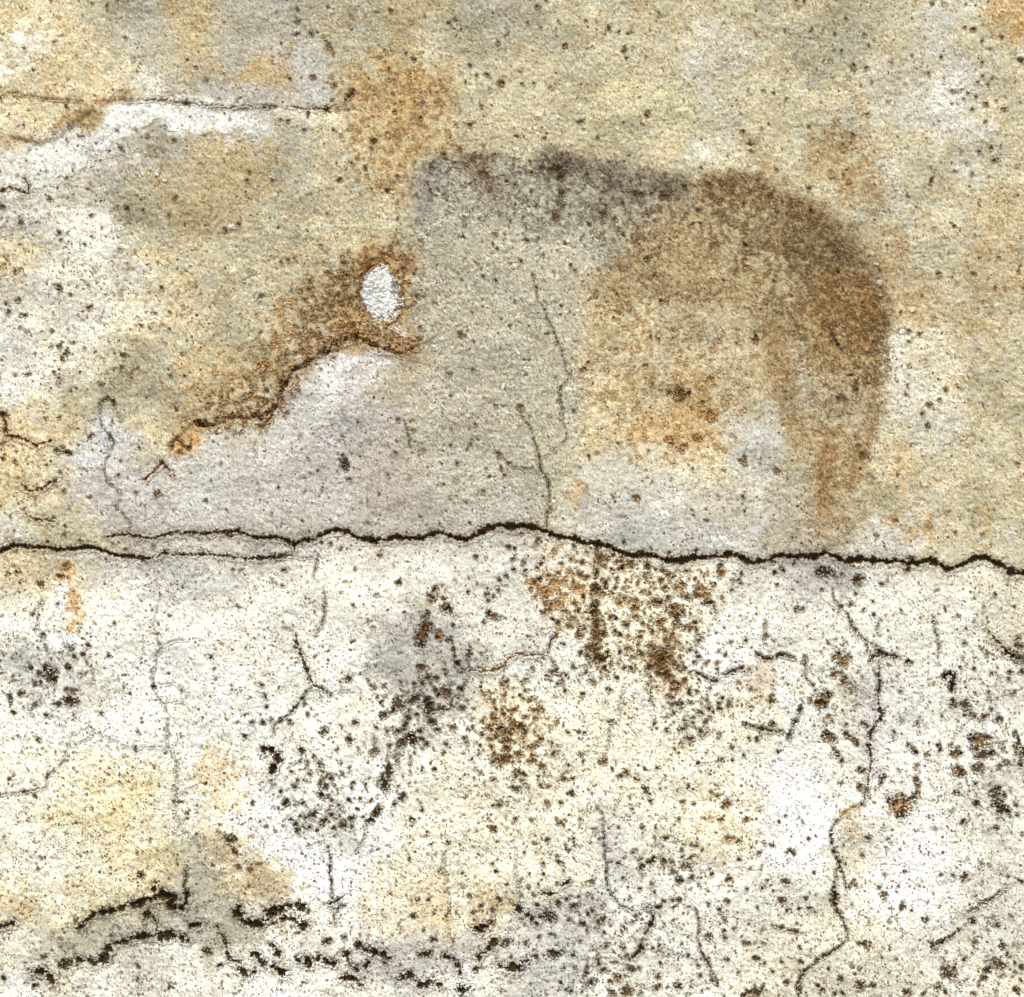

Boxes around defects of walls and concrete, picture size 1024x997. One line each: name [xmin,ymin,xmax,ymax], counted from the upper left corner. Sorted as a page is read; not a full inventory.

flaking render [0,246,419,552]
corrosion [166,227,437,460]
water stain [351,59,981,612]
crack [0,259,1024,997]
corrosion [517,538,746,710]